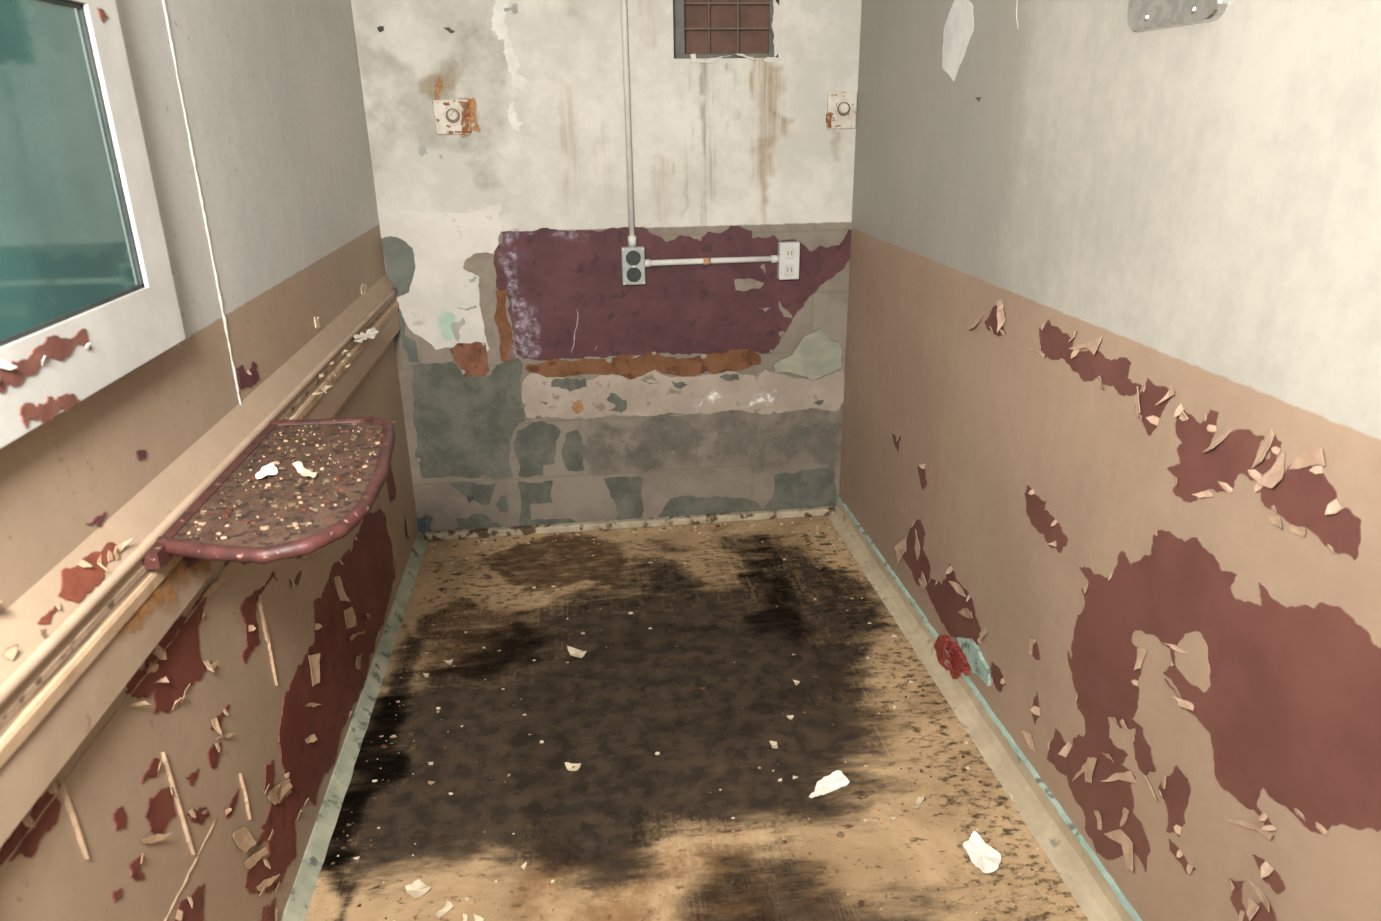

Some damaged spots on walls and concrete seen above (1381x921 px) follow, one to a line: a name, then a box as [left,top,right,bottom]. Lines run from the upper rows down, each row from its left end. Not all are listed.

corrosion [422,75,480,137]
peeling [0,328,92,393]
peeling [19,393,81,428]
peeling [449,224,852,422]
water stain [699,391,842,466]
peeling [1025,320,1361,560]
peeling [37,537,135,636]
peeling [895,519,1006,692]
peeling [111,464,396,921]
water stain [320,533,1079,921]
peeling [1022,529,1381,875]
peeling [0,781,61,864]